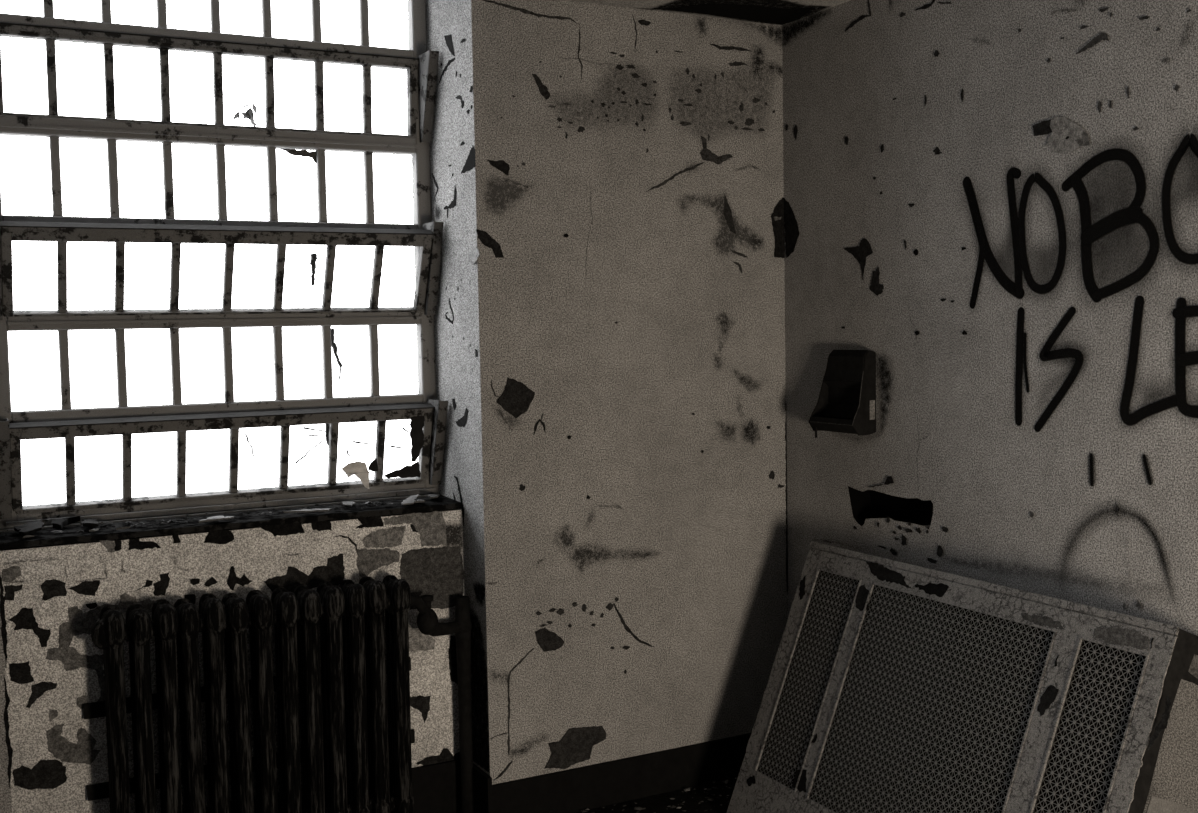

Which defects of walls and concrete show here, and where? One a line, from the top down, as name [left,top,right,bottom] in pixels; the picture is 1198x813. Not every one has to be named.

crack [646,136,758,192]
spalling [771,197,800,258]
peeling [843,238,884,296]
peeling [491,377,535,426]
peeling [89,526,181,553]
peeling [184,494,447,604]
spalling [848,476,949,611]
peeling [2,565,170,709]
peeling [408,626,458,684]
peeling [410,695,430,723]
peeling [12,709,100,790]
peeling [544,726,606,769]